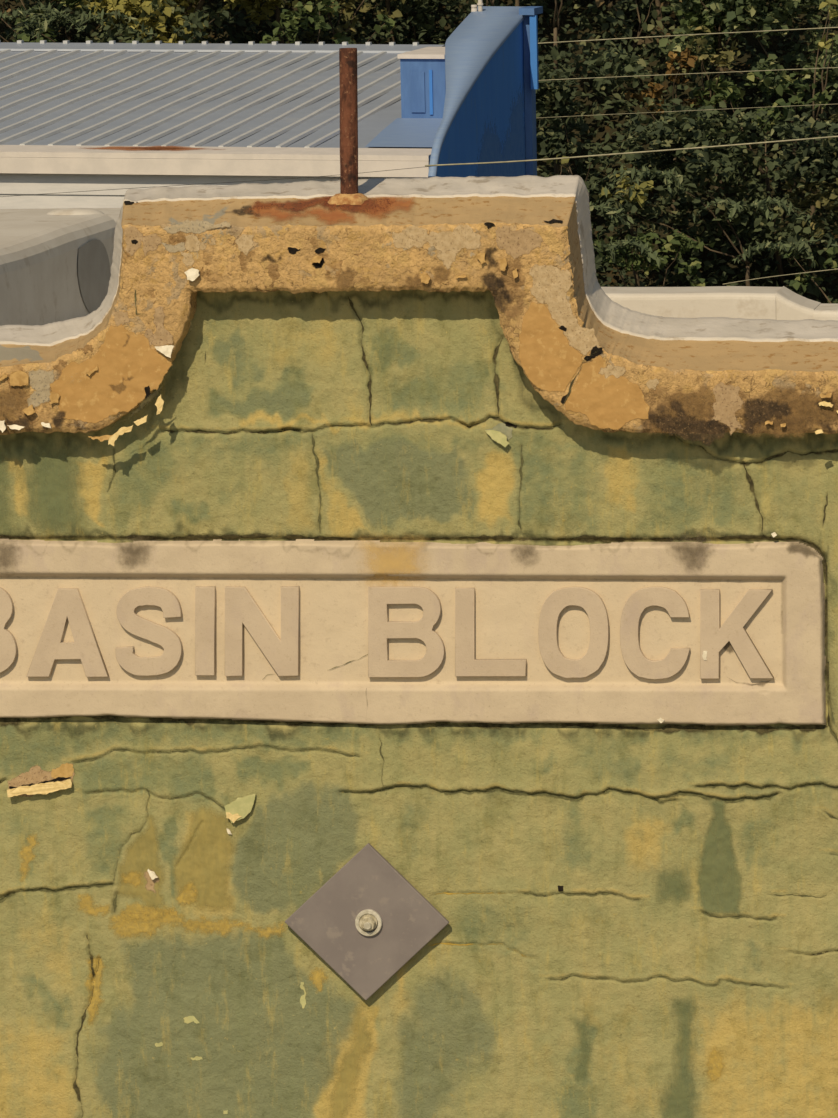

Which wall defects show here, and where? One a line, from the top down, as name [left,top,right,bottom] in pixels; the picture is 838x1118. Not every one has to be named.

spalling [124,220,230,281]
rust [249,196,412,224]
spalling [0,369,60,433]
crack [88,297,602,530]
spalling [712,382,744,434]
crack [700,446,838,530]
spalling [7,763,75,797]
peeling [224,794,256,835]
crack [306,738,838,819]
leakage [661,802,740,913]
crack [73,935,100,1116]
leakage [664,1004,693,1118]